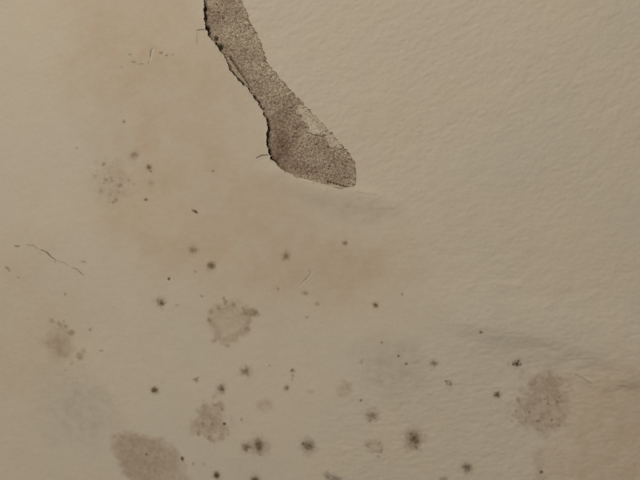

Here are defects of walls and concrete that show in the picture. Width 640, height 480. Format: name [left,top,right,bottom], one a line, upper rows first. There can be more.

peeling [200,0,360,192]